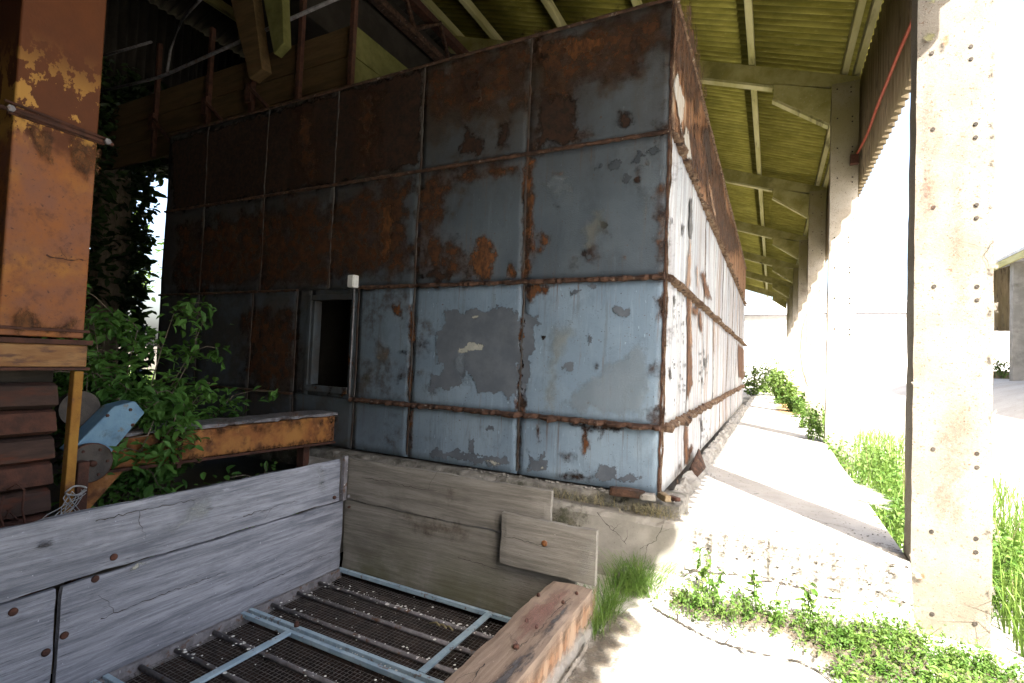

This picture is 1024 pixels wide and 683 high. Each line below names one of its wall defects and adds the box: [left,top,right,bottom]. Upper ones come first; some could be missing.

rust [618,111,633,128]
rust [657,0,739,256]
rust [411,159,549,301]
rust [14,309,77,334]
rust [391,303,426,396]
peeling [428,305,546,400]
rust [686,251,715,399]
rust [648,406,666,425]
peeling [595,463,642,483]
crack [597,512,680,550]